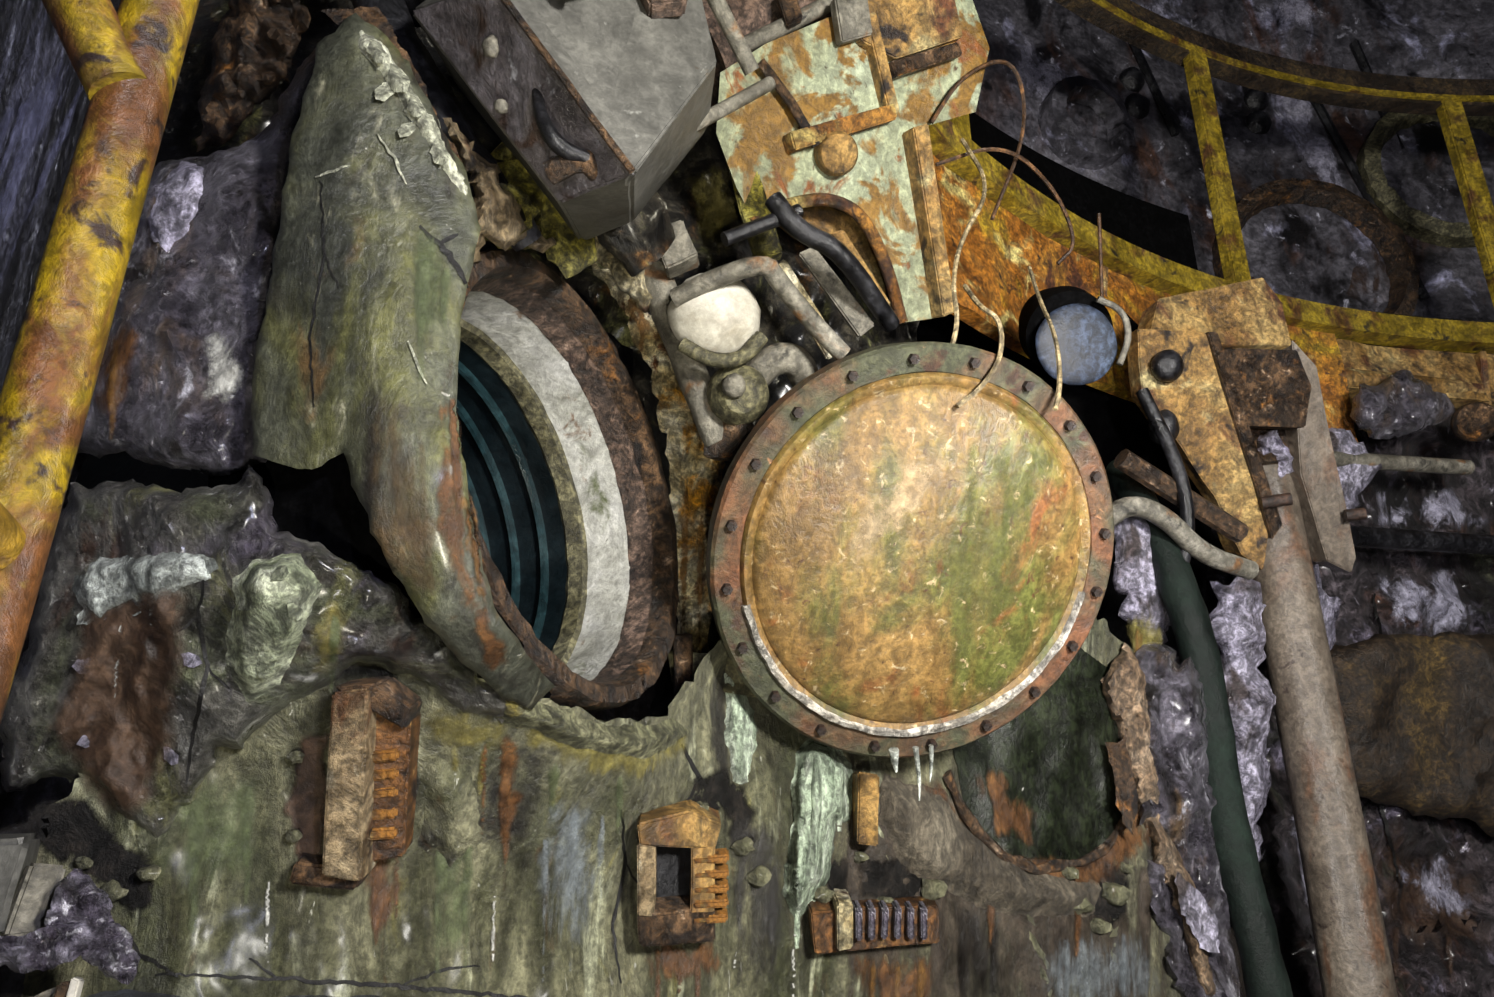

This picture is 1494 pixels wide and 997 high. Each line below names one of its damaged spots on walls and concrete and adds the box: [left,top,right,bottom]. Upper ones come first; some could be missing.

corrosion [365,713,421,942]
corrosion [480,738,522,858]
corrosion [651,943,719,997]
corrosion [856,959,931,997]